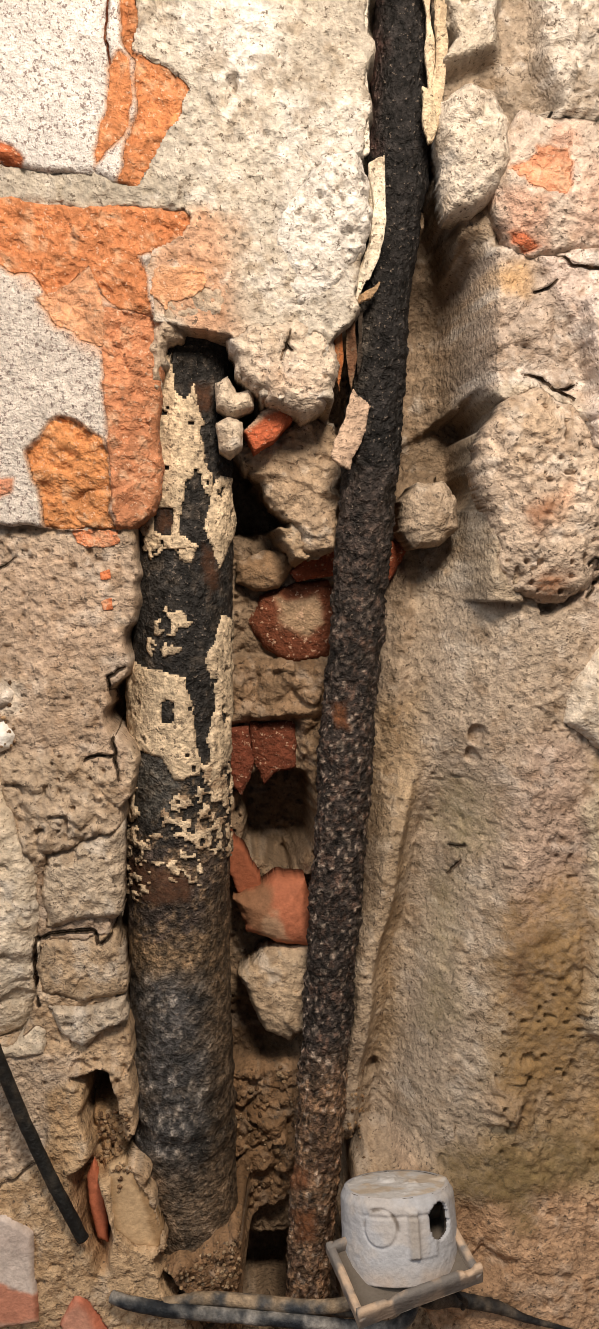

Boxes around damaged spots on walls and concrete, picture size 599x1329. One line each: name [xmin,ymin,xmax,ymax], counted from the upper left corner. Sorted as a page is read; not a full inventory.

spalling [95,0,190,186]
spalling [0,143,22,166]
crack [533,255,599,293]
spalling [0,196,237,569]
corrosion [196,388,210,408]
crack [524,374,576,401]
crack [83,666,127,782]
flaking render [125,606,234,903]
corrosion [128,858,189,902]
crack [33,893,128,1007]